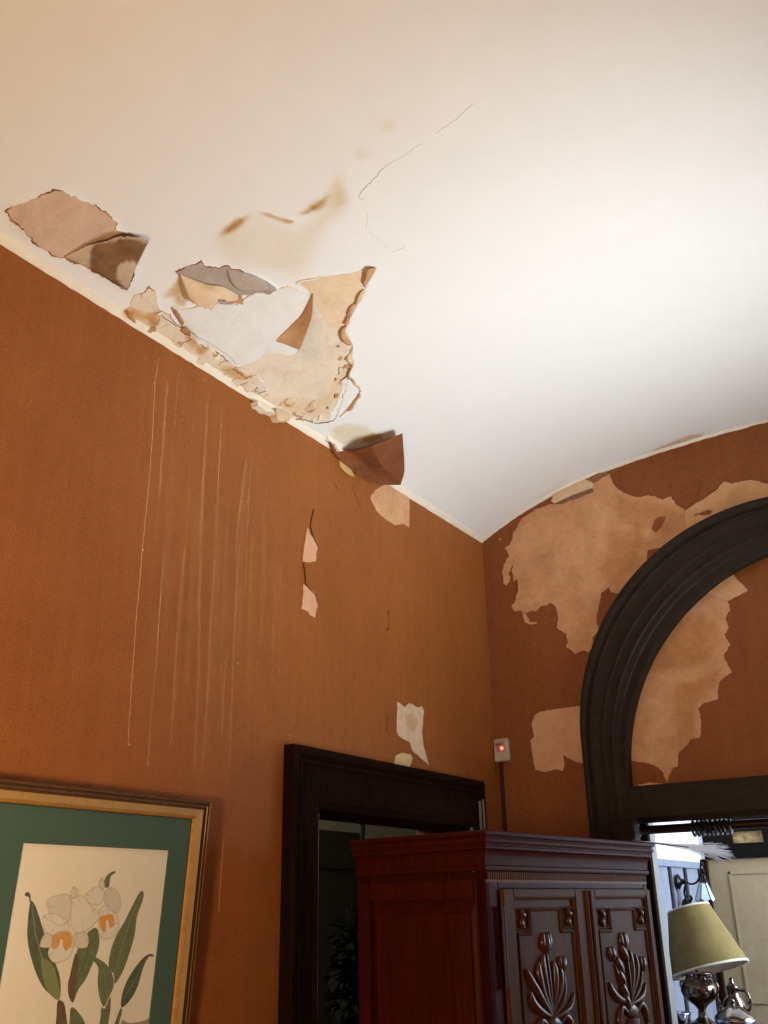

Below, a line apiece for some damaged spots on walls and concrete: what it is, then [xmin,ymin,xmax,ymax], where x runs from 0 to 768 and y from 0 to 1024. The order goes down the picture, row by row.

peeling [0,184,376,424]
peeling [324,436,354,477]
damp [128,410,154,744]